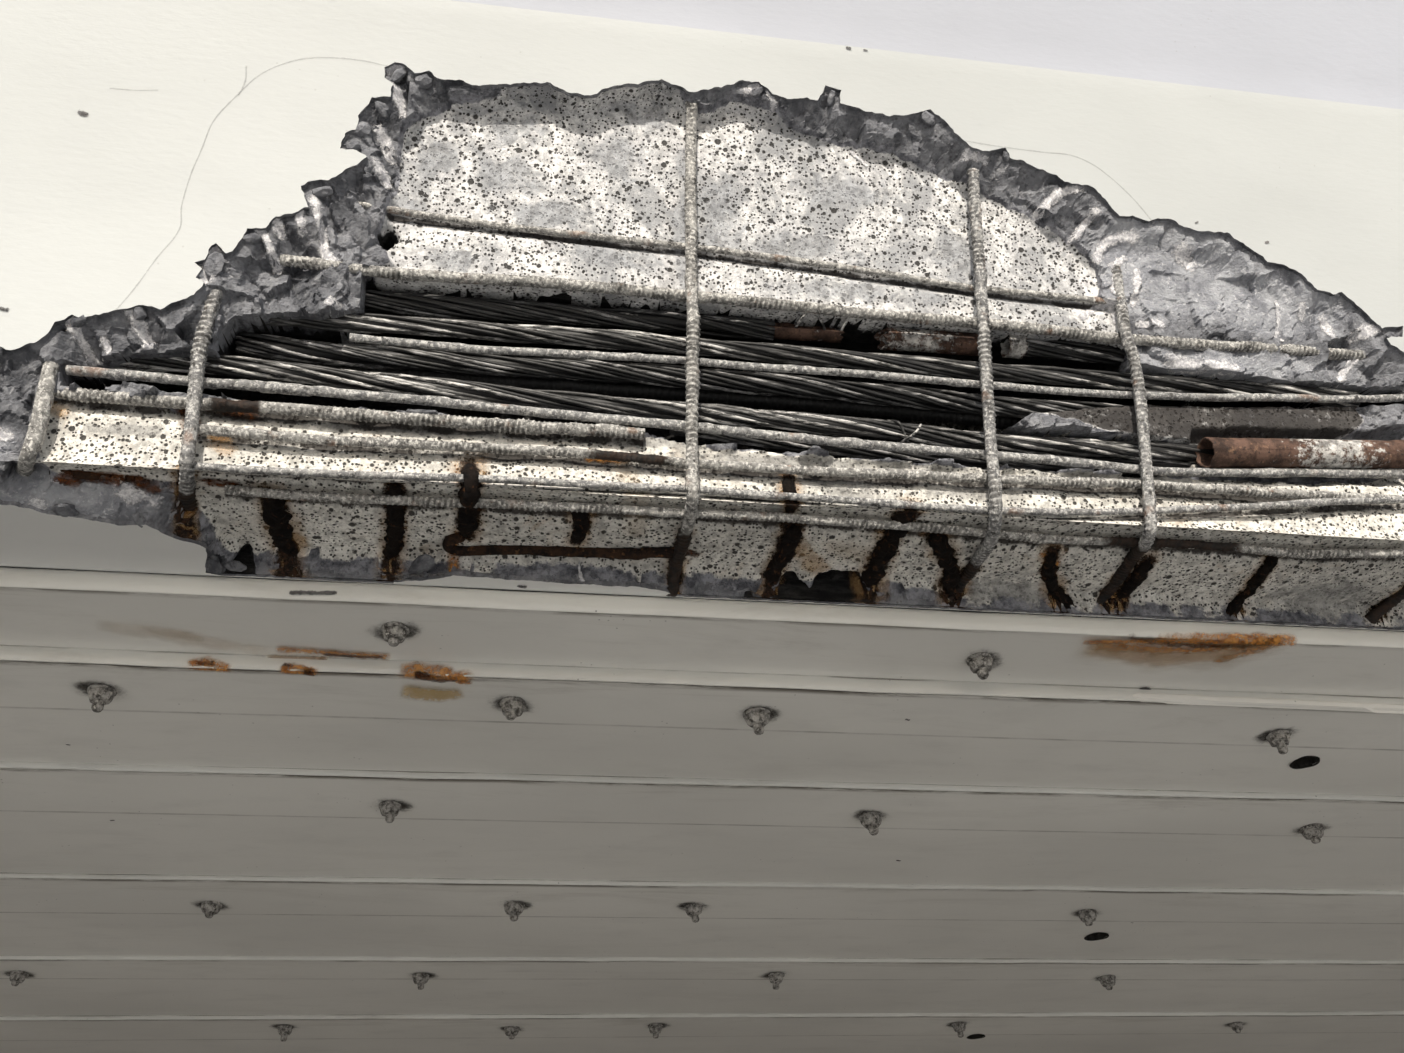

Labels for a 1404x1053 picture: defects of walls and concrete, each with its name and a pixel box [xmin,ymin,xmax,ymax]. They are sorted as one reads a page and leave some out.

spalling [0,65,1404,628]
rust [222,412,257,422]
rust [200,478,240,487]
rust [277,647,387,676]
rust [1084,633,1295,662]
rust [403,663,470,701]